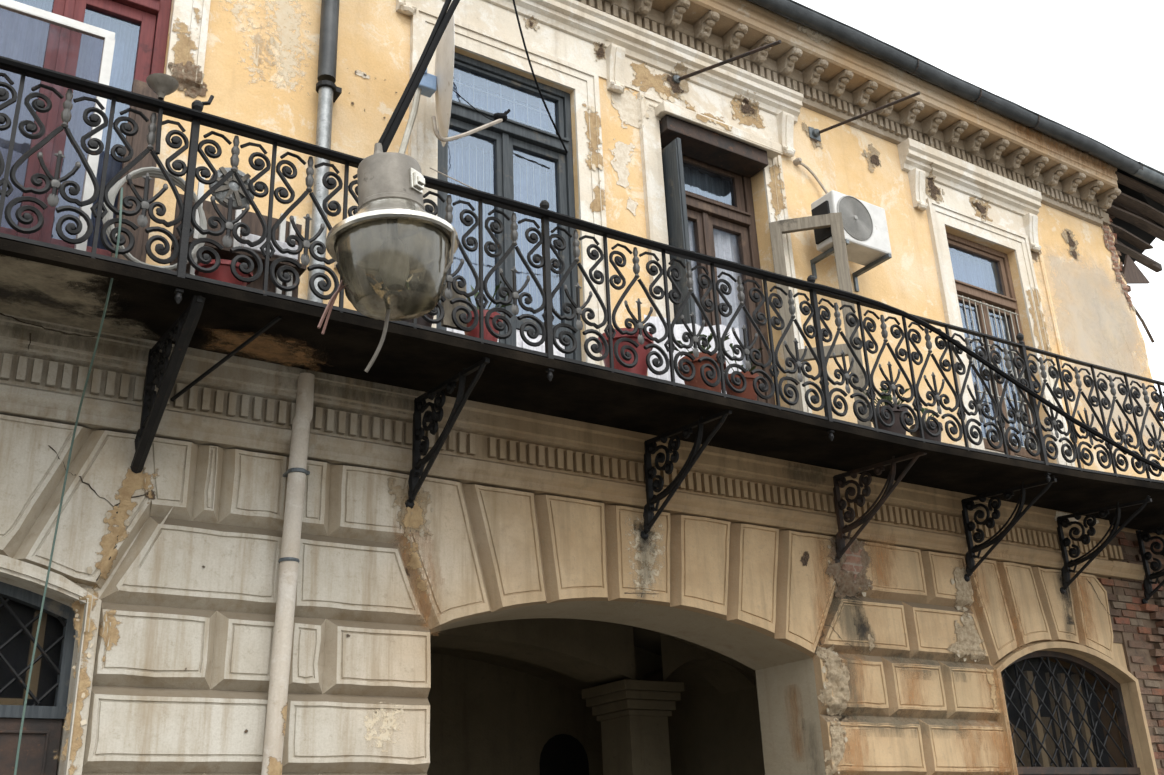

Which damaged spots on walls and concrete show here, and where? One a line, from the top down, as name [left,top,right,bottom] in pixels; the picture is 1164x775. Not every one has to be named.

spalling [168,8,208,98]
peeling [582,62,766,216]
crack [48,445,147,581]
spalling [388,477,434,550]
peeling [54,468,158,775]
spalling [826,535,873,600]
damp [834,594,873,645]
peeling [947,566,986,662]
flaking render [1097,532,1164,775]
peeling [364,705,406,751]
spalling [815,644,850,775]